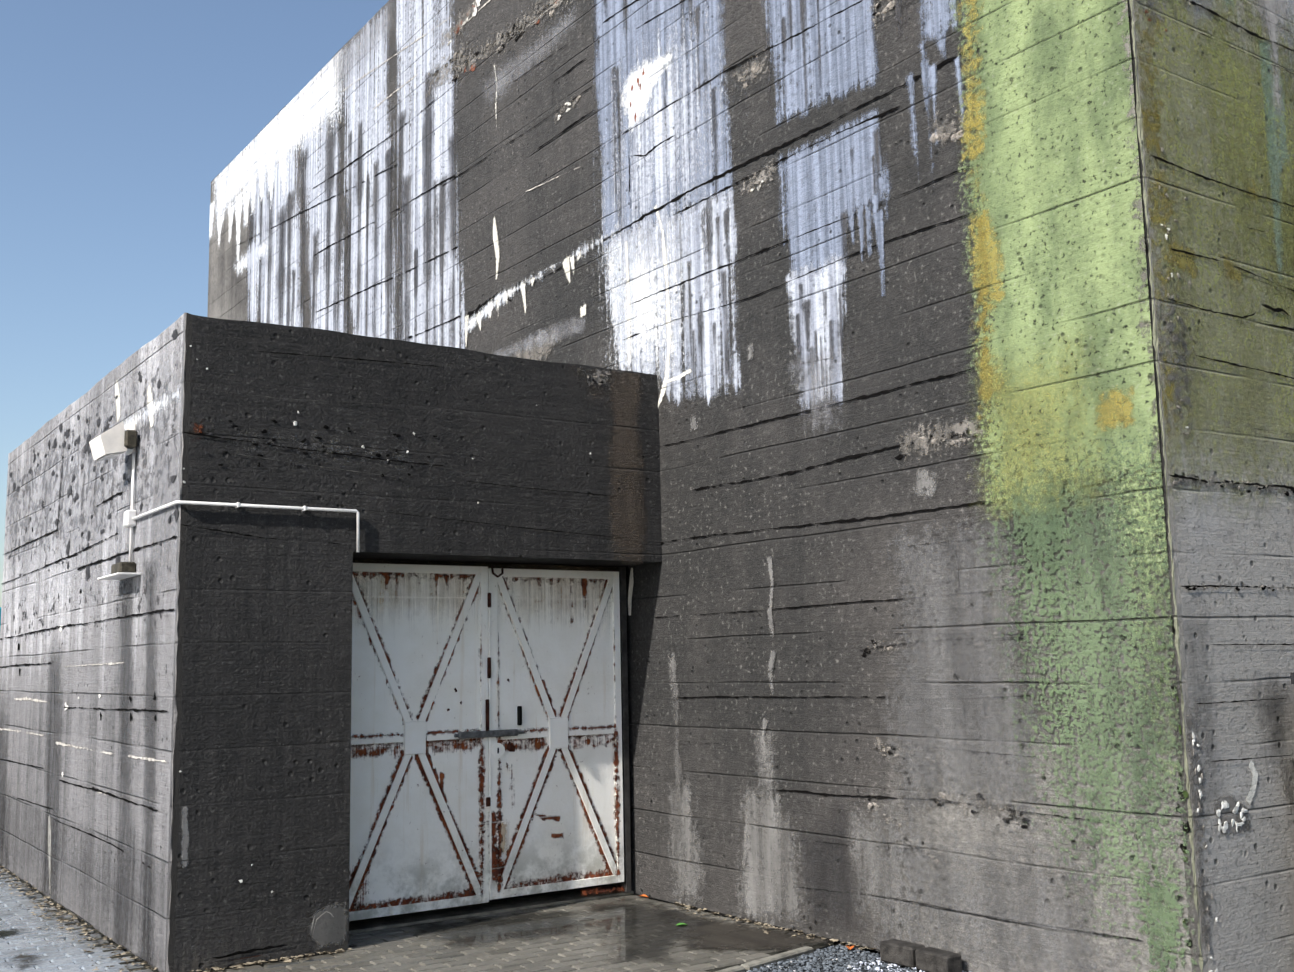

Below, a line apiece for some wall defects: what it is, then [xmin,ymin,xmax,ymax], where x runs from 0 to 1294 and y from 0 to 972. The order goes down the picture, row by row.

spalling [425,0,572,101]
leakage [765,0,877,124]
leakage [907,0,965,154]
leakage [209,0,741,404]
leakage [779,111,889,409]
crack [1151,155,1294,239]
corrosion [578,371,647,564]
crack [655,596,930,618]
crack [369,473,1294,593]
leakage [887,366,1079,809]
crack [863,633,1132,650]
corrosion [349,571,624,912]